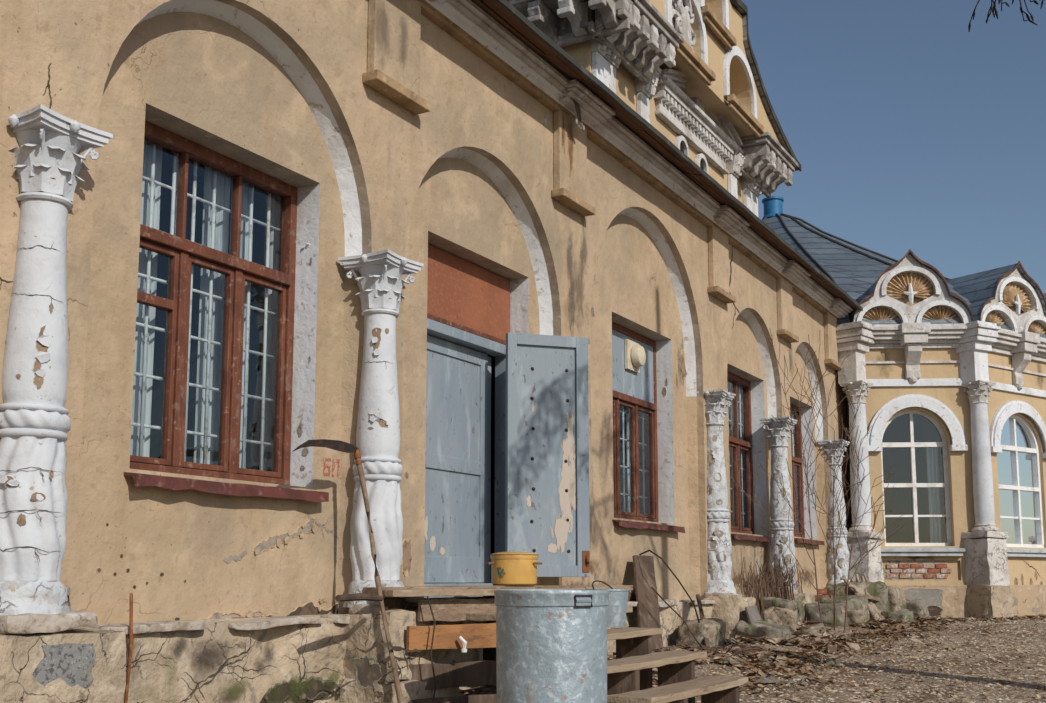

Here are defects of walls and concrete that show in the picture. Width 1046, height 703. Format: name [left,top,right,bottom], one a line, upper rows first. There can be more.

crack [43,63,52,109]
crack [0,277,62,311]
peeling [16,325,51,390]
peeling [372,327,389,358]
peeling [368,411,390,430]
peeling [707,435,723,505]
crack [1,509,60,523]
crack [0,546,62,562]
spalling [224,517,317,563]
flaking render [883,561,952,580]
crack [126,634,276,703]
crack [292,629,422,703]